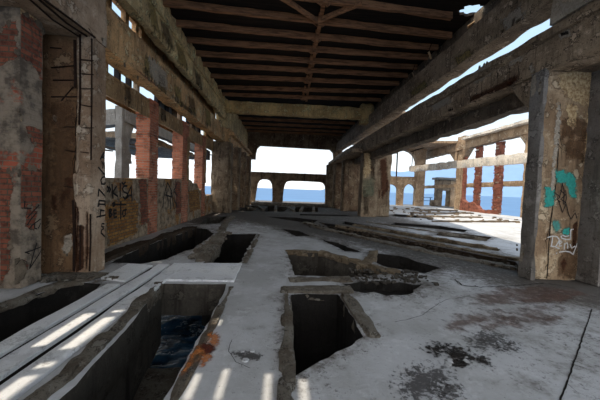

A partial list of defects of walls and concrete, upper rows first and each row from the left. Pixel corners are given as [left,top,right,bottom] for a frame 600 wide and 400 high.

spalling [0,12,45,76]
spalling [29,0,106,271]
spalling [0,164,42,285]
corrosion [178,332,220,376]
damp [388,286,584,400]
crack [559,309,598,400]